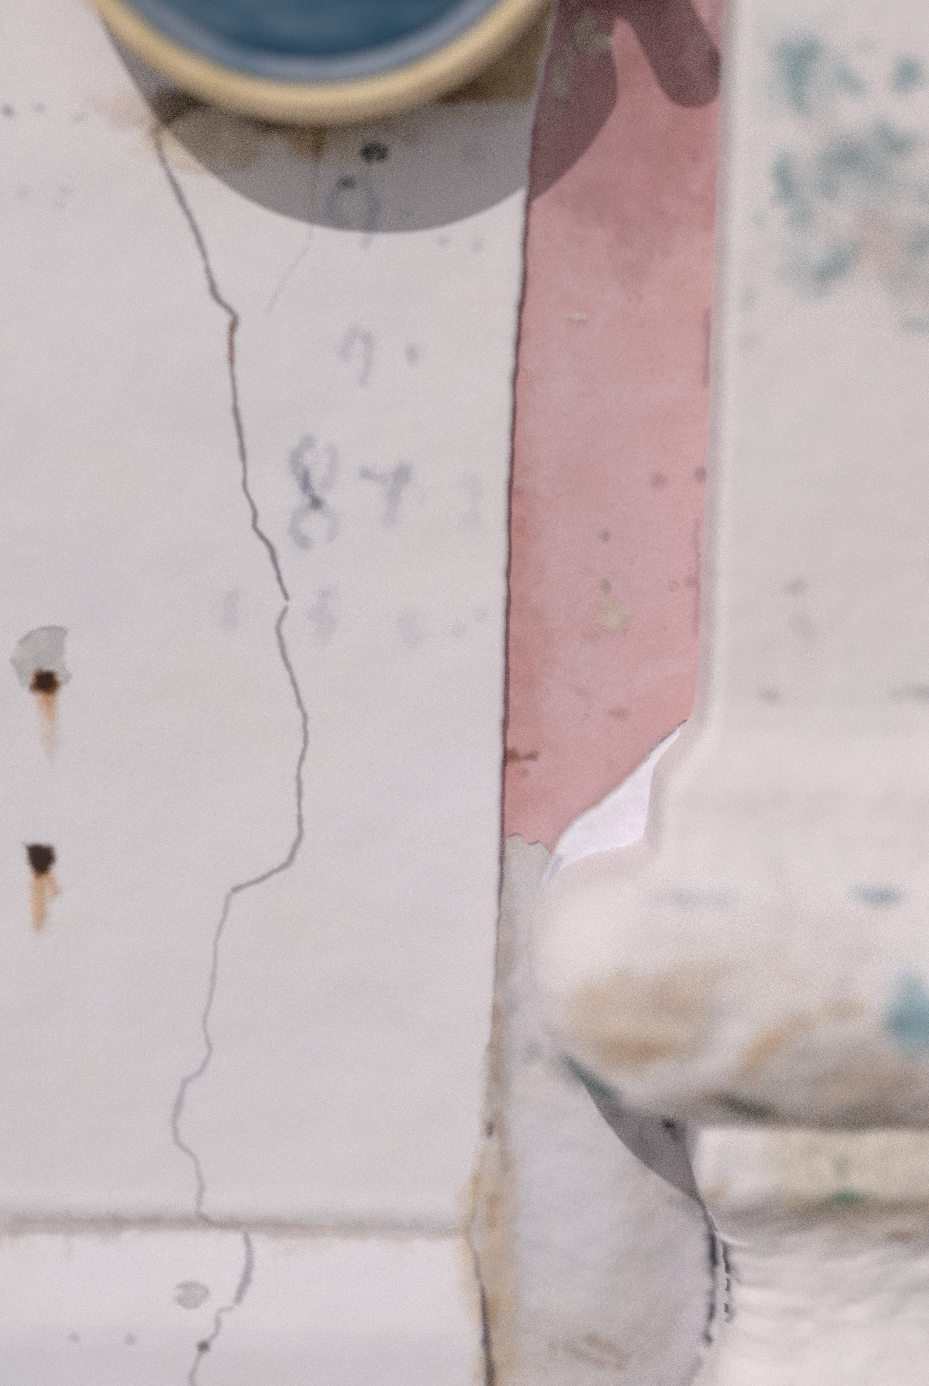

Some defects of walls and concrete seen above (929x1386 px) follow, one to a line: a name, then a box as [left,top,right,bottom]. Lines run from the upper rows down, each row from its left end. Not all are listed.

damp [438,0,554,103]
crack [156,107,193,133]
damp [157,93,213,123]
corrosion [28,845,54,906]